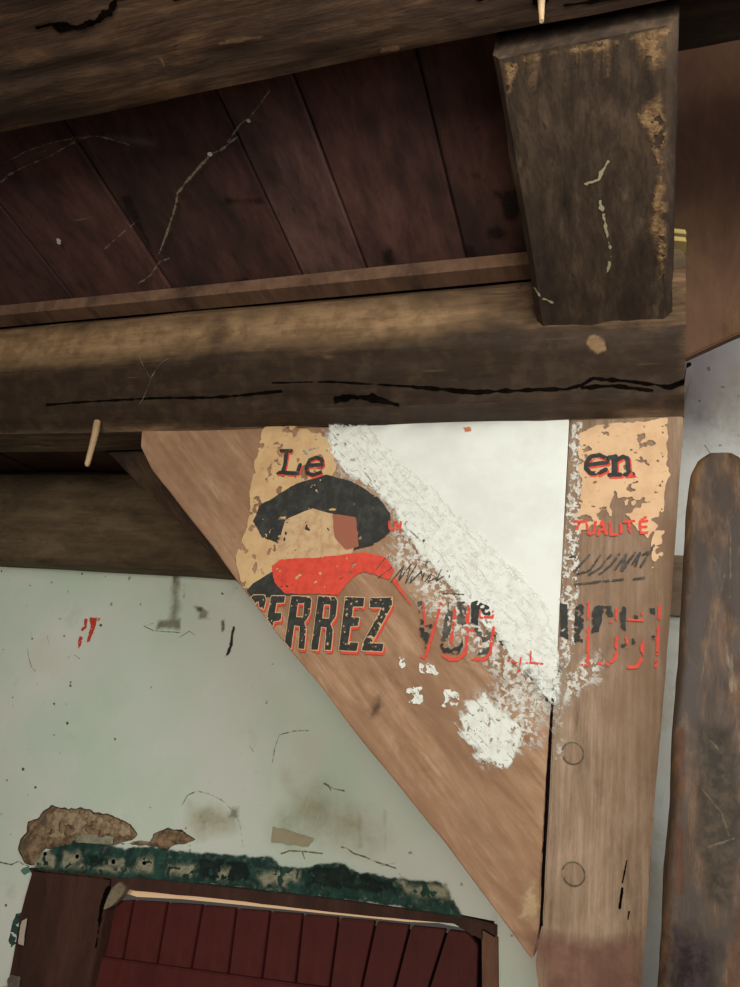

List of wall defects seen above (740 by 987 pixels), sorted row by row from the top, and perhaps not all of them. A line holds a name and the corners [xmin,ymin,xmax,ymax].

crack [35,0,117,33]
crack [46,362,691,407]
peeling [0,326,684,769]